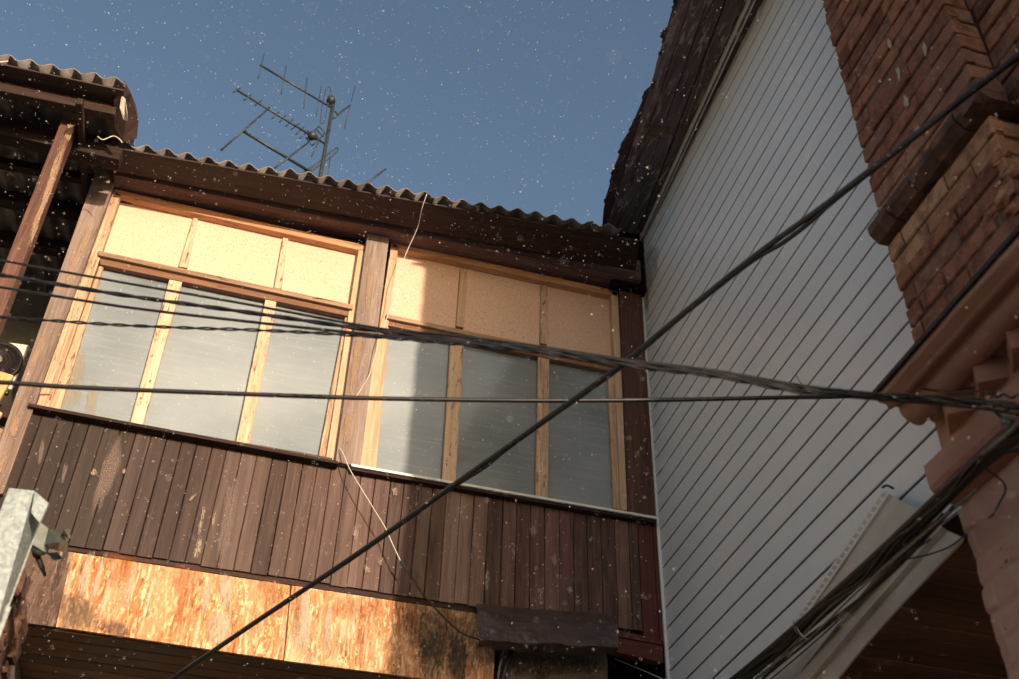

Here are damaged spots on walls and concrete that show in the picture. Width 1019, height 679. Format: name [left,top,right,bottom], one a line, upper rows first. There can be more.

water stain [406,604,474,679]